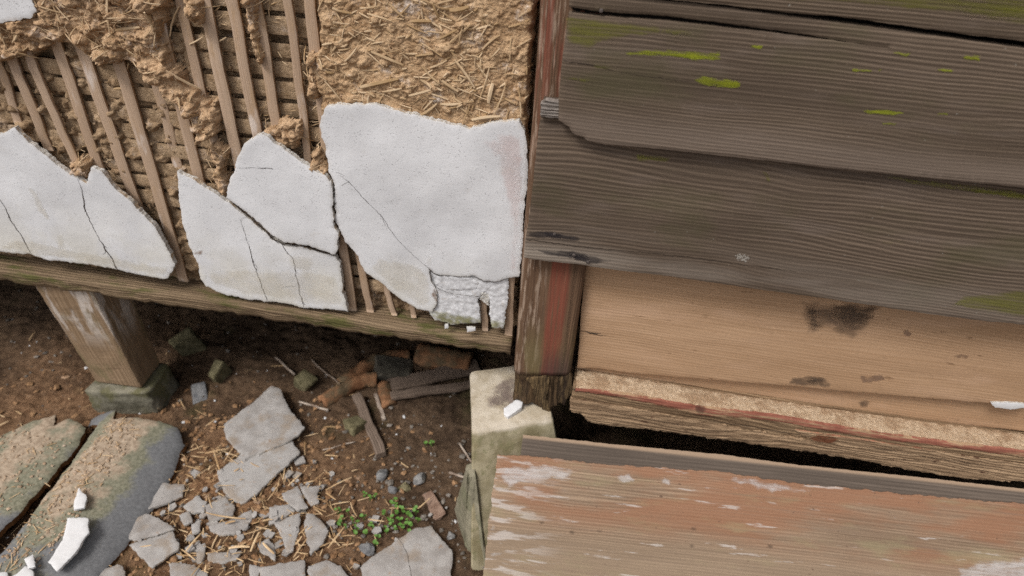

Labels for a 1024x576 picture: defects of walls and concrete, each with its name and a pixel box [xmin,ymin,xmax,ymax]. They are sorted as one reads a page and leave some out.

spalling [0,0,233,195]
spalling [240,0,282,65]
spalling [258,0,540,174]
crack [80,186,117,269]
crack [228,176,505,310]
peeling [429,270,510,332]